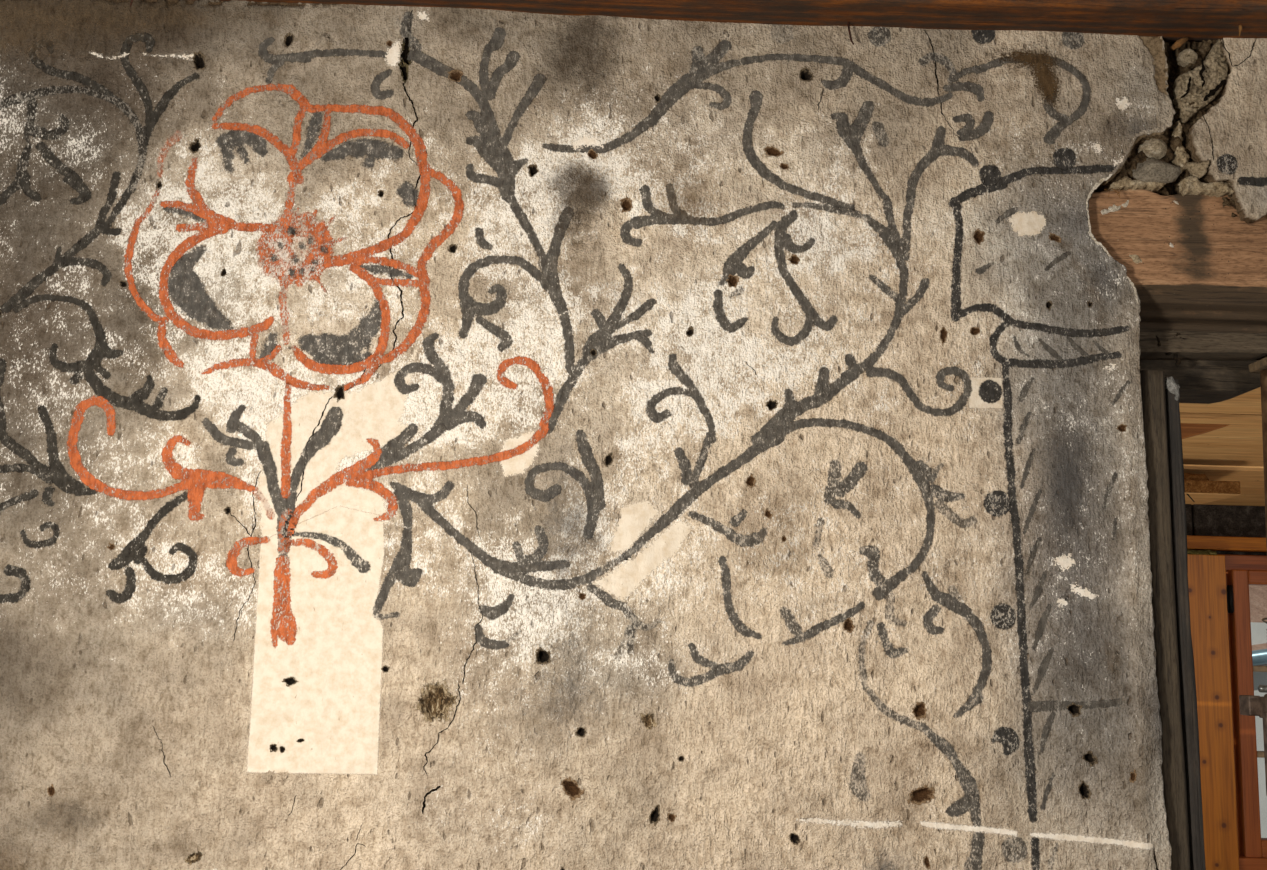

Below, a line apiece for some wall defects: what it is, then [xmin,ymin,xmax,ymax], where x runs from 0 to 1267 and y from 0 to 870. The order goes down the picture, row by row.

crack [296,10,427,501]
flaking render [1086,141,1124,257]
flaking render [1115,94,1132,112]
flaking render [1139,36,1169,95]
spalling [1147,134,1210,179]
crack [422,486,483,814]